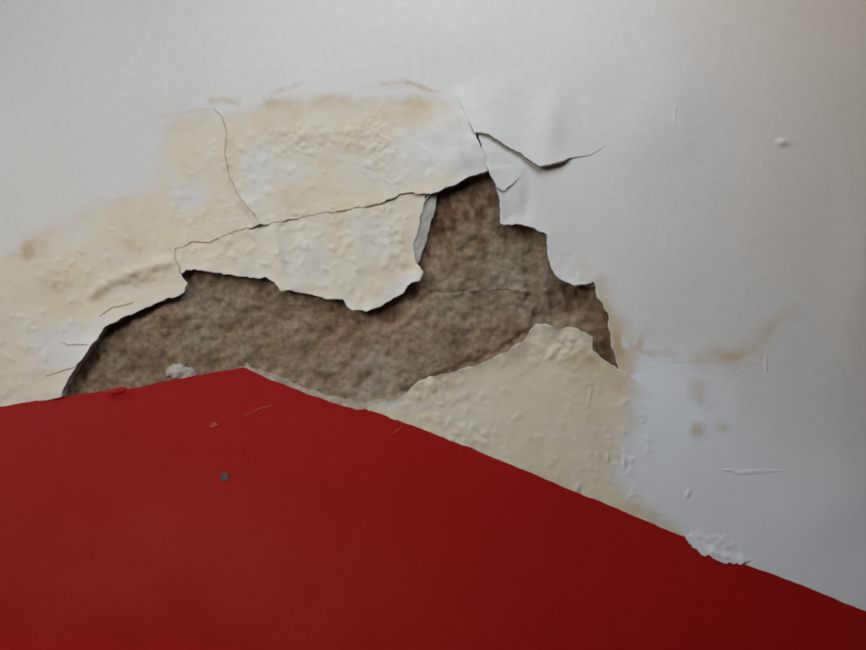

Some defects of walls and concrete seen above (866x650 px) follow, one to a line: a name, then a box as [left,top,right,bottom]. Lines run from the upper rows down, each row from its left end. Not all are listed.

damp [0,76,479,406]
crack [174,108,435,273]
spalling [0,37,753,565]
damp [368,254,805,537]